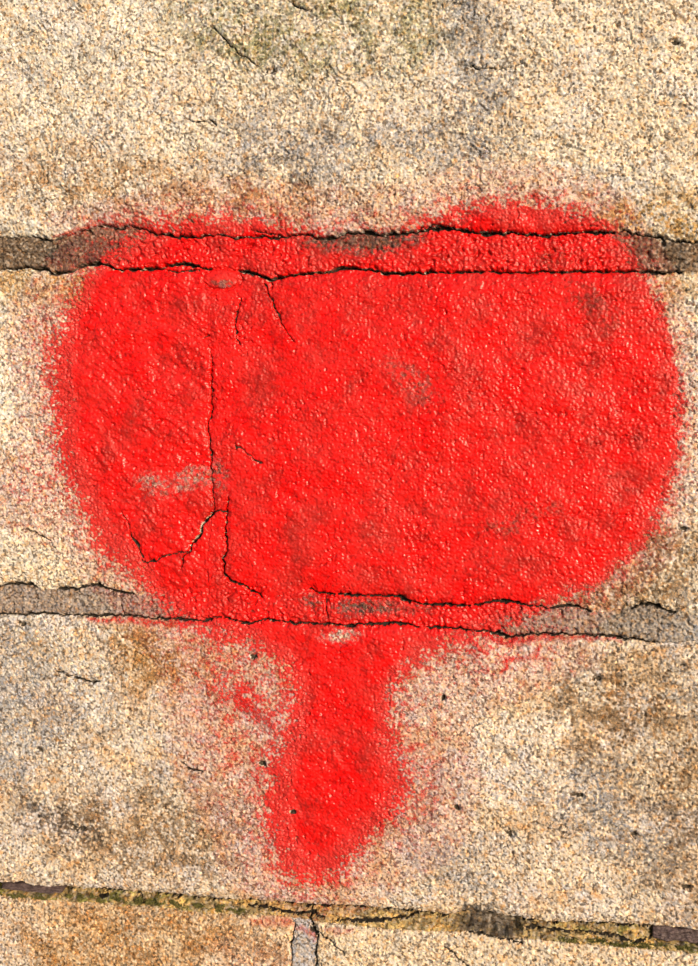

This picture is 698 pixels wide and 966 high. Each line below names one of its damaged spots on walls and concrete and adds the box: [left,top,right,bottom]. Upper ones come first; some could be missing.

crack [234,298,242,345]
crack [0,370,655,643]
crack [630,601,676,614]